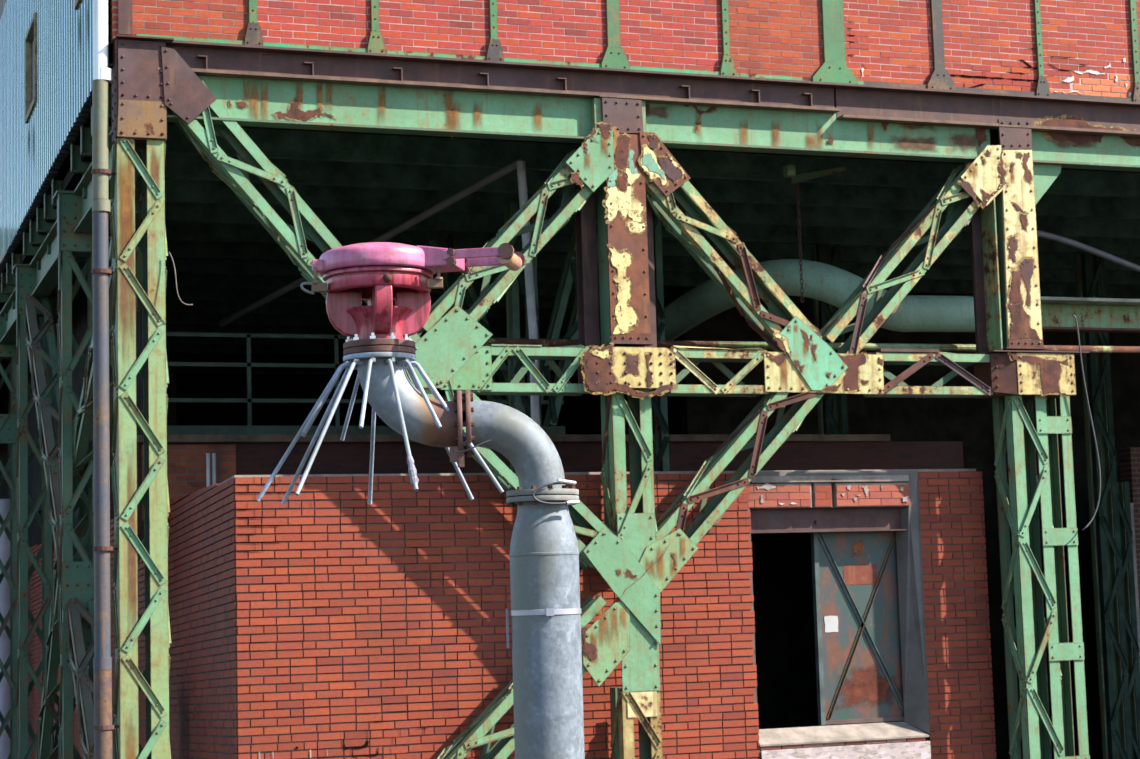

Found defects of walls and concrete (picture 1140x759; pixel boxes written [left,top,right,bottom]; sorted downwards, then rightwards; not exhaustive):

crack [949,48,1102,88]
corrosion [228,83,337,122]
corrosion [447,93,459,129]
corrosion [645,103,667,118]
corrosion [684,105,718,132]
corrosion [1033,115,1140,147]
peeling [602,126,686,235]
peeling [580,243,679,400]
corrosion [763,326,818,386]
corrosion [821,352,884,394]
corrosion [581,539,685,663]
corrosion [840,666,900,706]